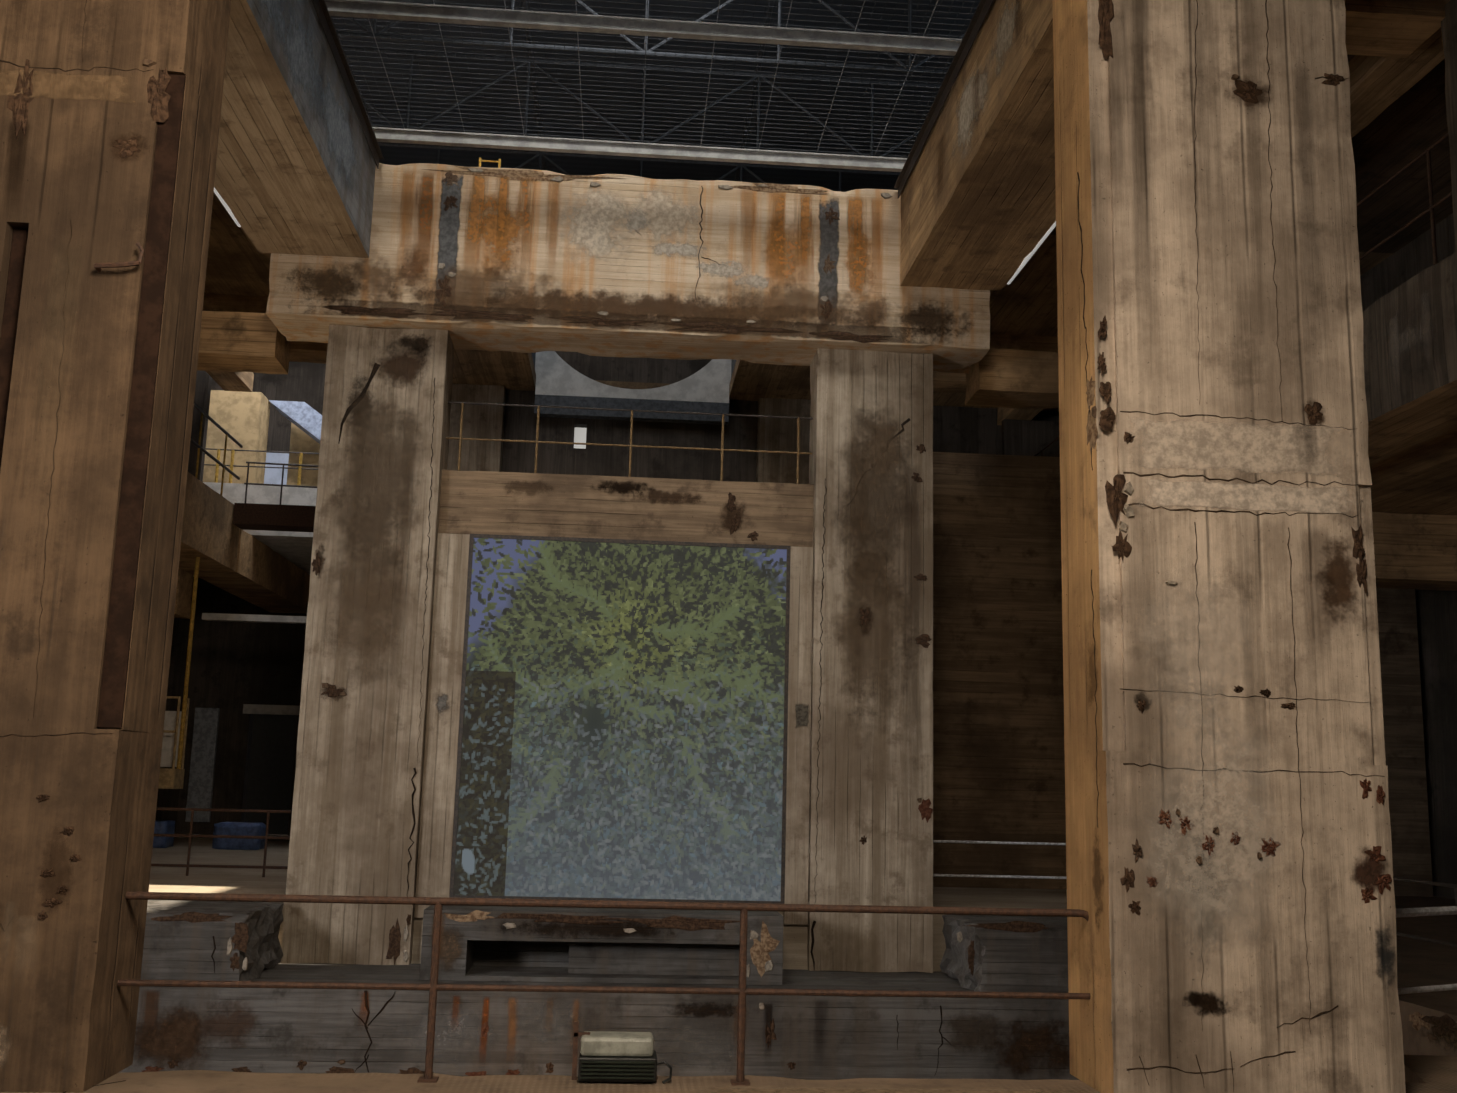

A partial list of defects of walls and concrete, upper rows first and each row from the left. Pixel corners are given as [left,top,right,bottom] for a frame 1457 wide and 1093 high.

rust [401,175,434,285]
rust [466,176,532,269]
leakage [293,192,966,343]
rust [767,195,812,281]
rust [847,199,870,292]
leakage [338,337,428,566]
leakage [598,481,699,503]
leakage [842,414,912,704]
rust [481,999,489,1046]
spalling [118,910,1079,1080]